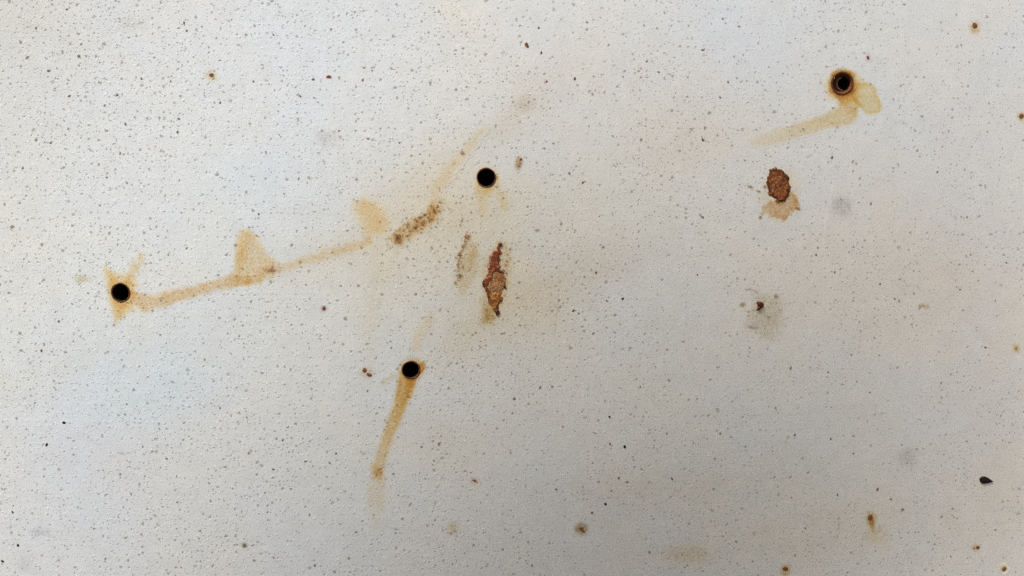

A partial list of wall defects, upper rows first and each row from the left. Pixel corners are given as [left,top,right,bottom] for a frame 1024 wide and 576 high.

rust [744,52,884,149]
rust [101,122,517,330]
rust [747,162,806,228]
rust [357,354,428,536]